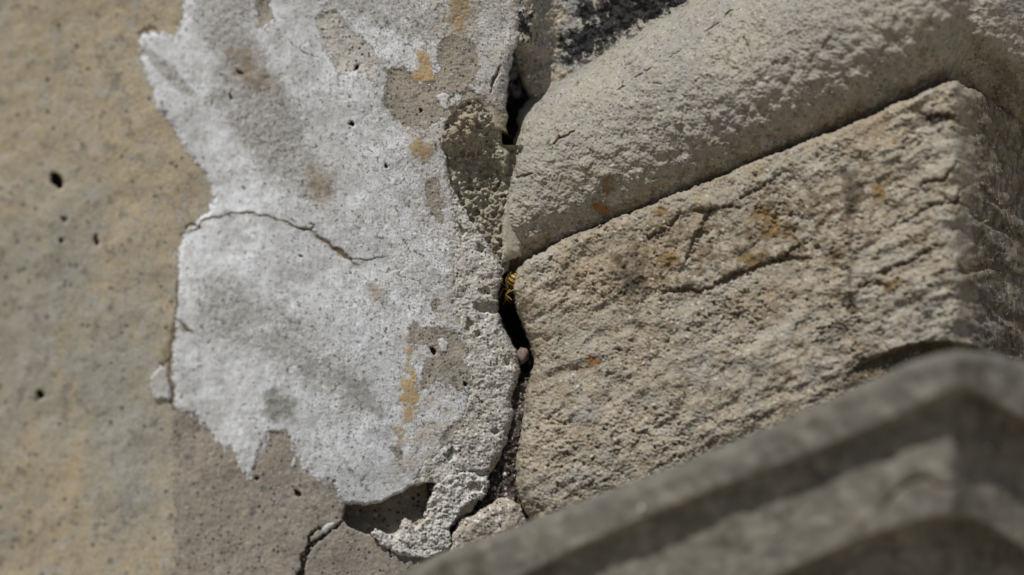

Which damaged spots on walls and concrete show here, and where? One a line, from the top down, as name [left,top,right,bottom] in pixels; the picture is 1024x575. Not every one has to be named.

spalling [315,10,524,273]
corrosion [412,51,434,81]
crack [490,56,532,145]
crack [181,212,373,266]
crack [648,180,806,294]
crack [859,249,931,288]
crack [894,161,1024,277]
corrosion [393,339,419,446]
crack [451,270,533,532]
peeling [149,365,490,575]
crack [426,483,434,498]
crack [296,520,344,575]